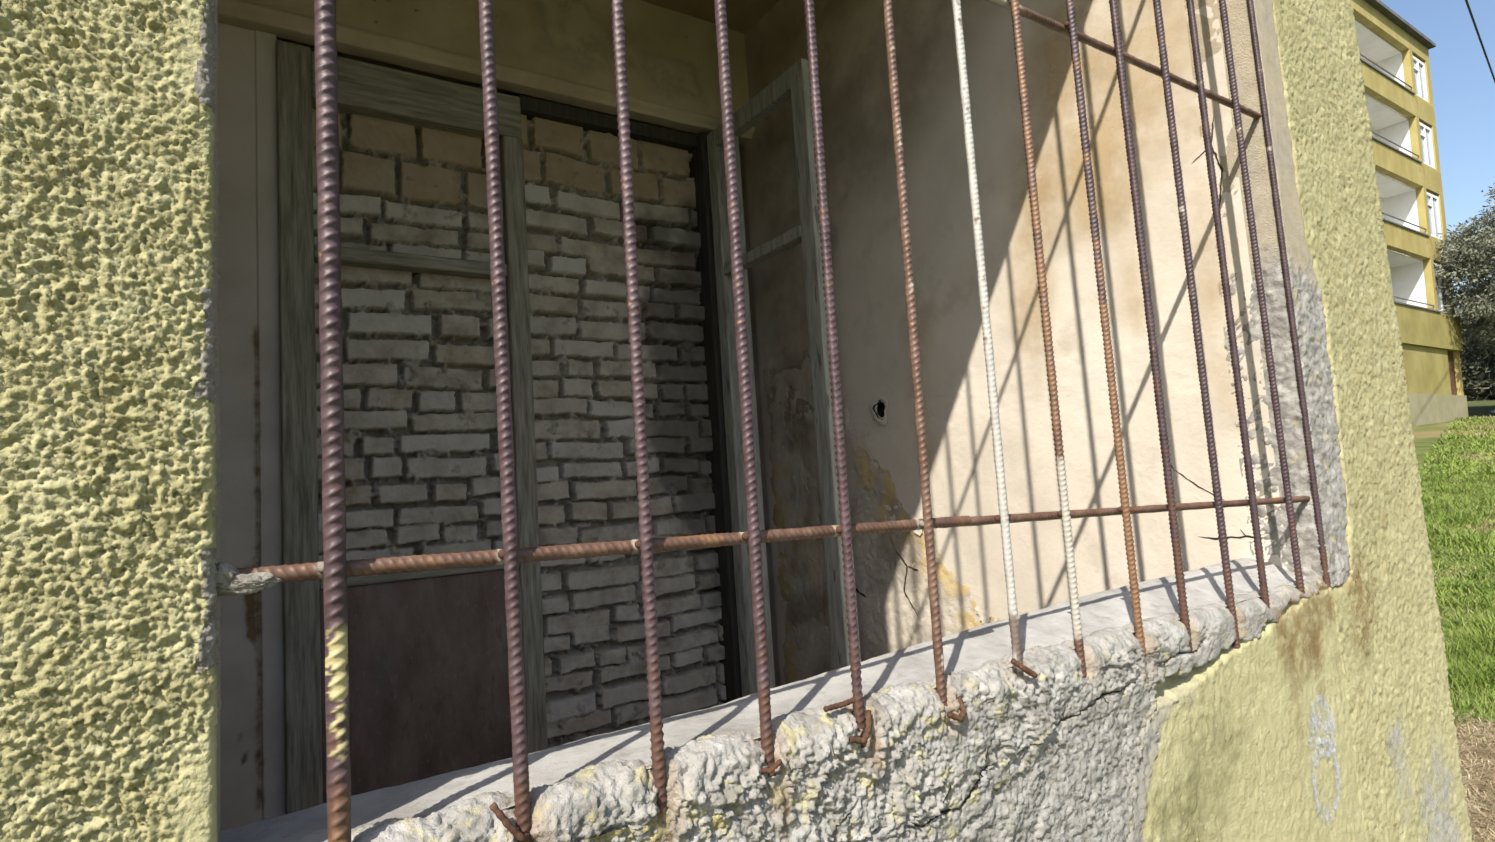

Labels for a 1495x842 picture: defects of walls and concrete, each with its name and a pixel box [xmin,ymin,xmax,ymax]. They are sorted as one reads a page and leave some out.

spalling [194,0,217,121]
spalling [195,287,218,404]
flaking render [351,0,1350,842]
corrosion [245,591,261,642]
crack [831,641,1203,842]